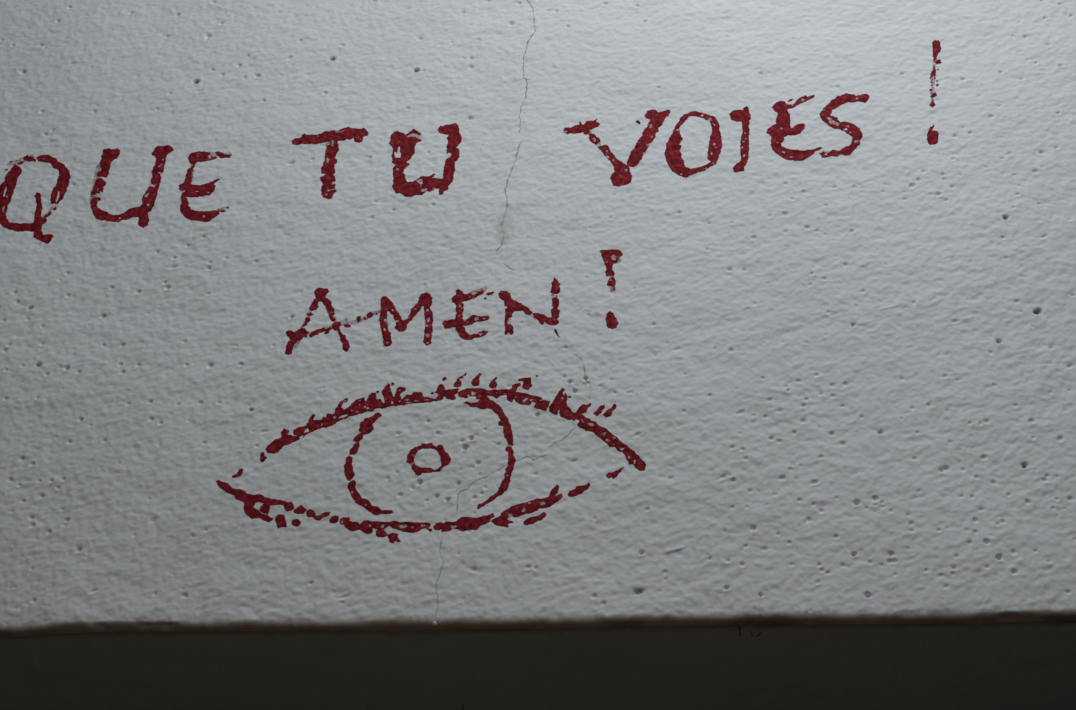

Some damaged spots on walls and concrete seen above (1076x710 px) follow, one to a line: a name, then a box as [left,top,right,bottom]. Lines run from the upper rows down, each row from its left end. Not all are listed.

crack [496,0,536,270]
crack [554,328,592,390]
crack [456,428,575,512]